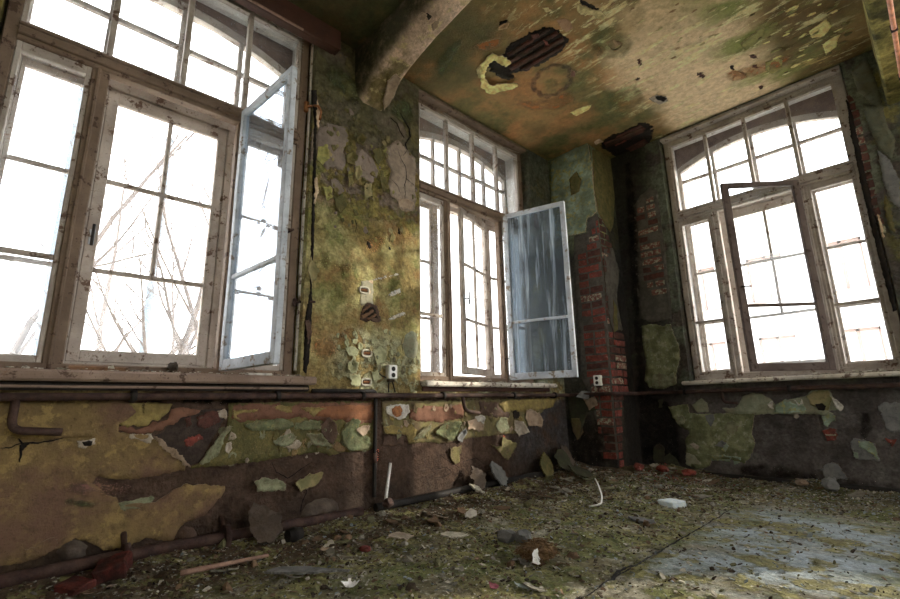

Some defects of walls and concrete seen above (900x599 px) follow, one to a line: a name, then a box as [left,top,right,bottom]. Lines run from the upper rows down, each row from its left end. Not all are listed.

spalling [476,18,573,94]
spalling [303,90,418,373]
spalling [550,122,654,467]
peeling [634,188,844,469]
crack [4,438,62,462]
peeling [0,397,556,566]
spalling [850,402,900,461]